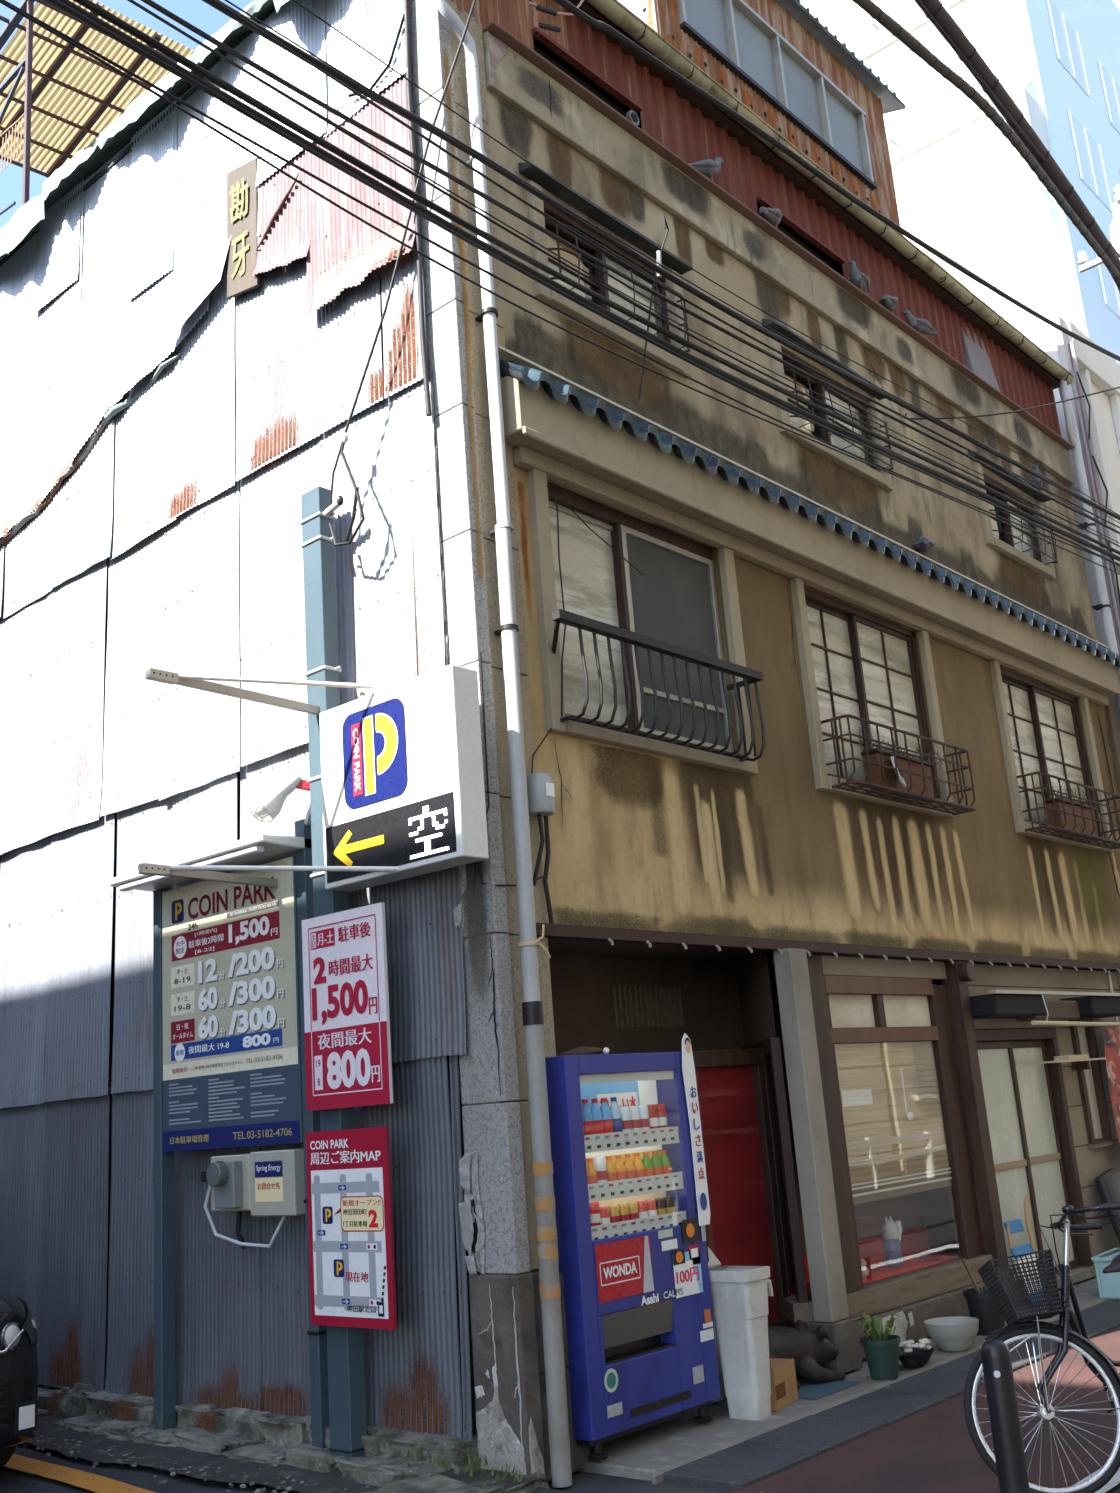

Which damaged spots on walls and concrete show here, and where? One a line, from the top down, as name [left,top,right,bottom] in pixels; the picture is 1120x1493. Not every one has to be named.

rust [359,224,421,404]
rust [164,363,225,520]
rust [247,316,306,477]
damp [546,722,1120,963]
spalling [458,1150,485,1275]
rust [188,1357,311,1433]
rust [375,1333,458,1435]
crack [480,1284,522,1444]